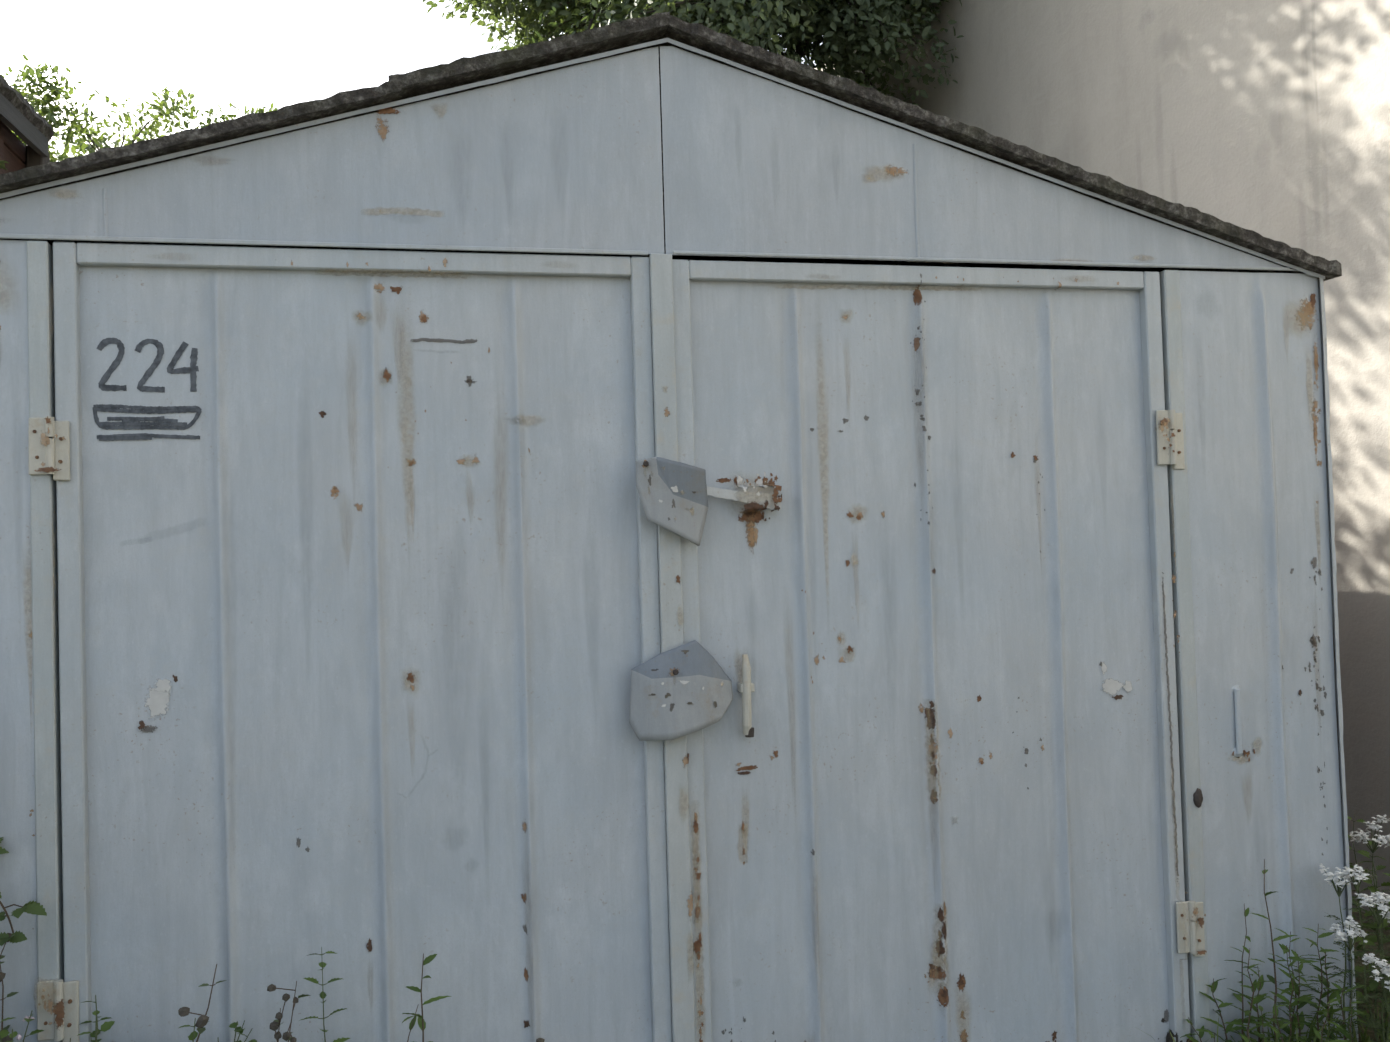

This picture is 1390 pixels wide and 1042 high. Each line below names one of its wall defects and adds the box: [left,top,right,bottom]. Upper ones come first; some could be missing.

corrosion [376,107,400,139]
corrosion [1296,293,1322,466]
corrosion [716,472,782,547]
peeling [138,675,178,733]
corrosion [736,750,778,775]
corrosion [919,701,953,804]
corrosion [688,857,702,967]
corrosion [924,902,968,1042]